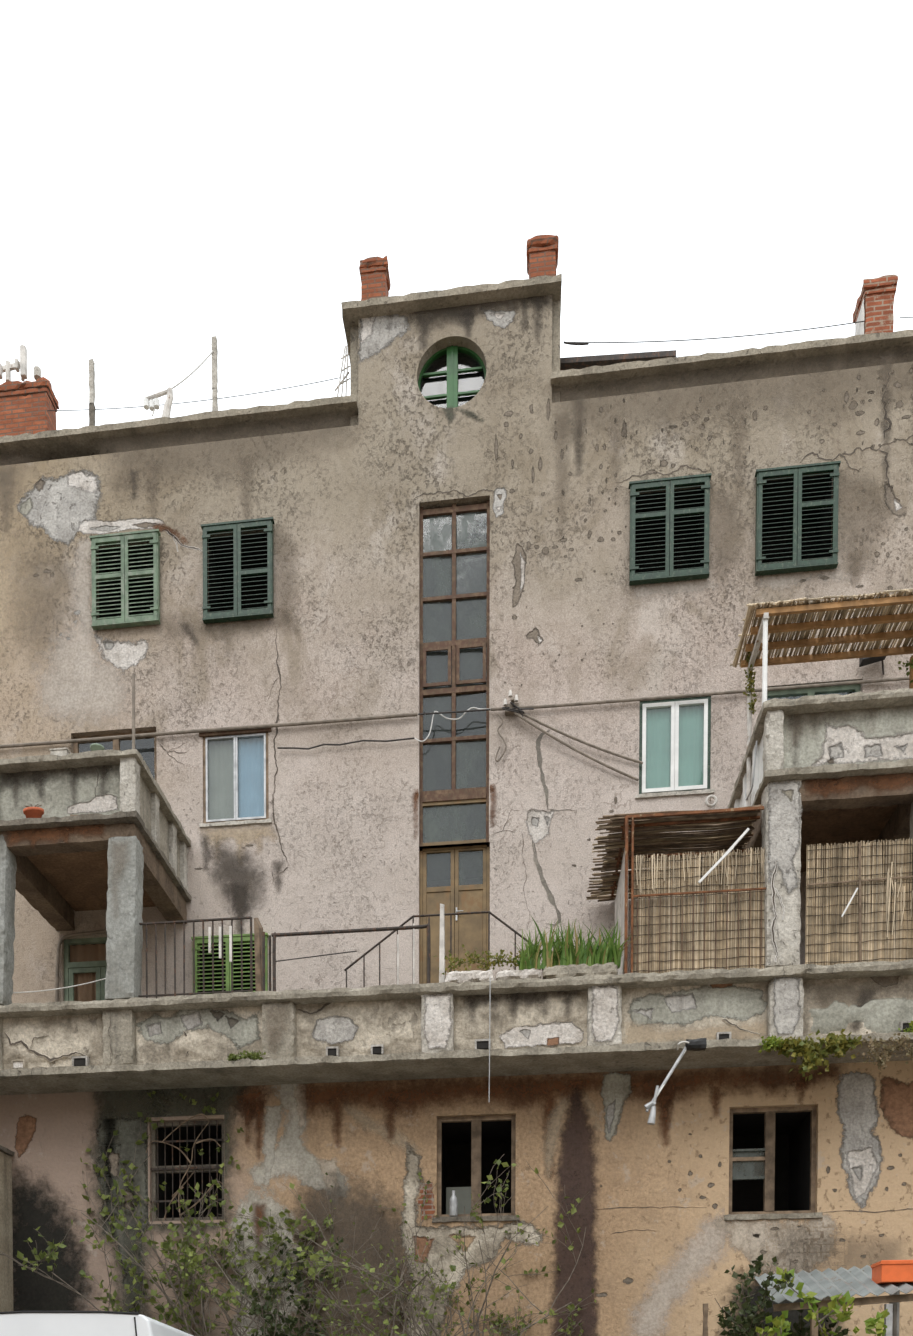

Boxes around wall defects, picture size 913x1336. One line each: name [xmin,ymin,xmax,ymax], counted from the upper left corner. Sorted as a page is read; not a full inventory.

crack [800,370,913,511]
peeling [17,469,156,718]
crack [268,629,289,884]
crack [495,729,577,928]
flaking render [15,1115,37,1157]
water stain [291,1073,603,1336]
flaking render [400,1142,543,1336]
flaking render [600,1072,632,1141]
water stain [623,1063,839,1143]
flaking render [826,1071,913,1211]